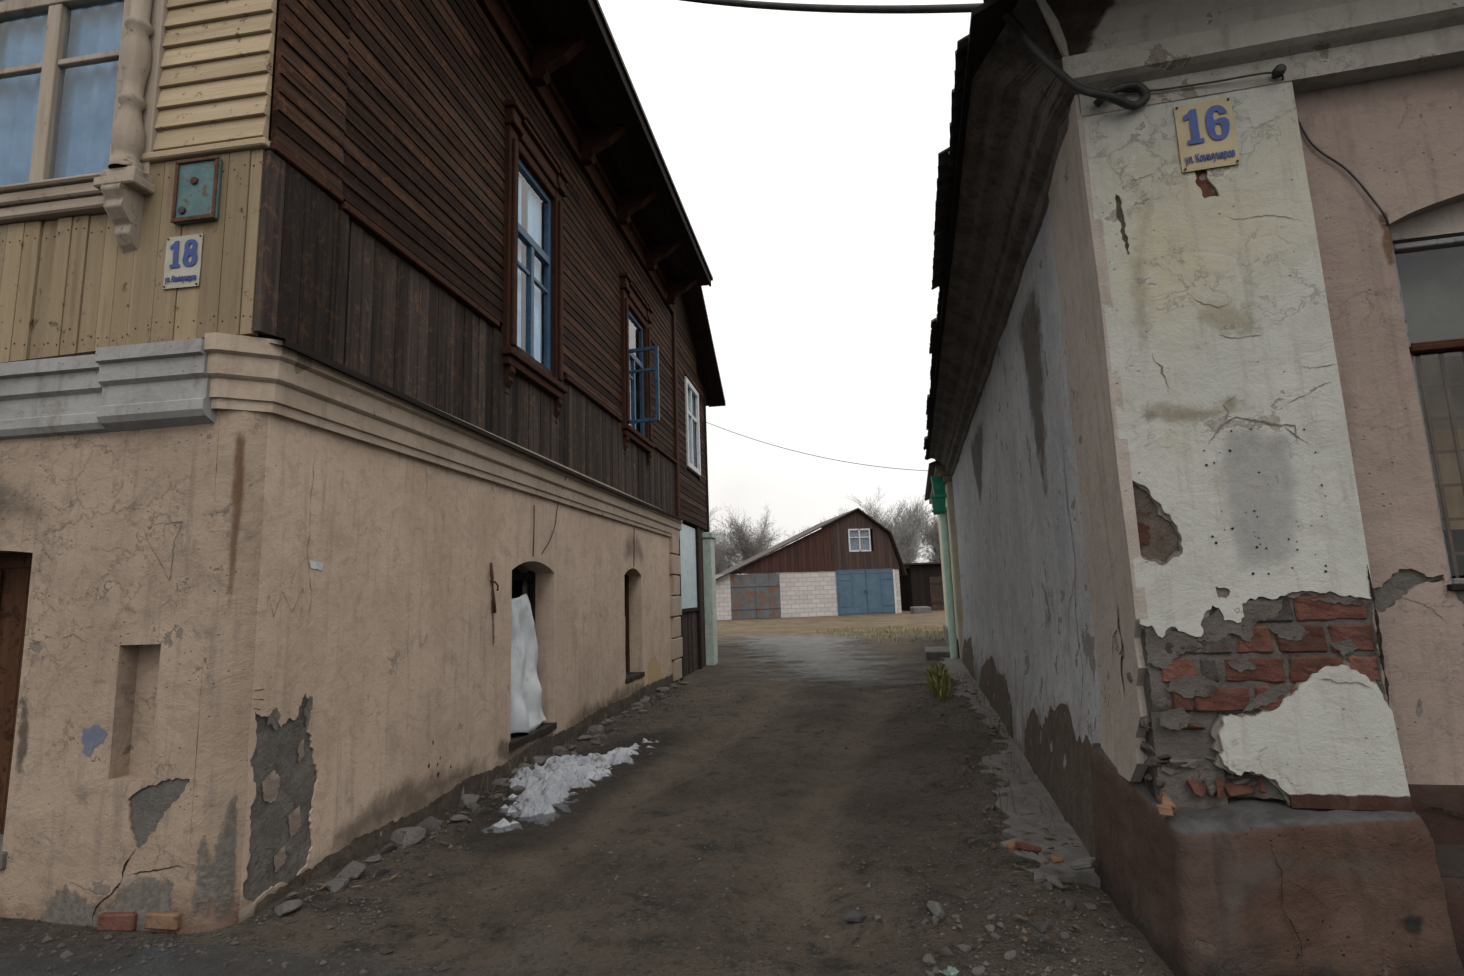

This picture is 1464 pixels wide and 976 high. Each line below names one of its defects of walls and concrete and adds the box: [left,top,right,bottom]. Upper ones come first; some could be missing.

crack [1192,296,1260,338]
crack [1211,364,1332,444]
flaking render [1124,484,1180,562]
flaking render [1119,569,1442,819]
flaking render [962,636,1095,857]
flaking render [130,778,190,848]
flaking render [243,673,679,915]
crack [69,849,181,925]